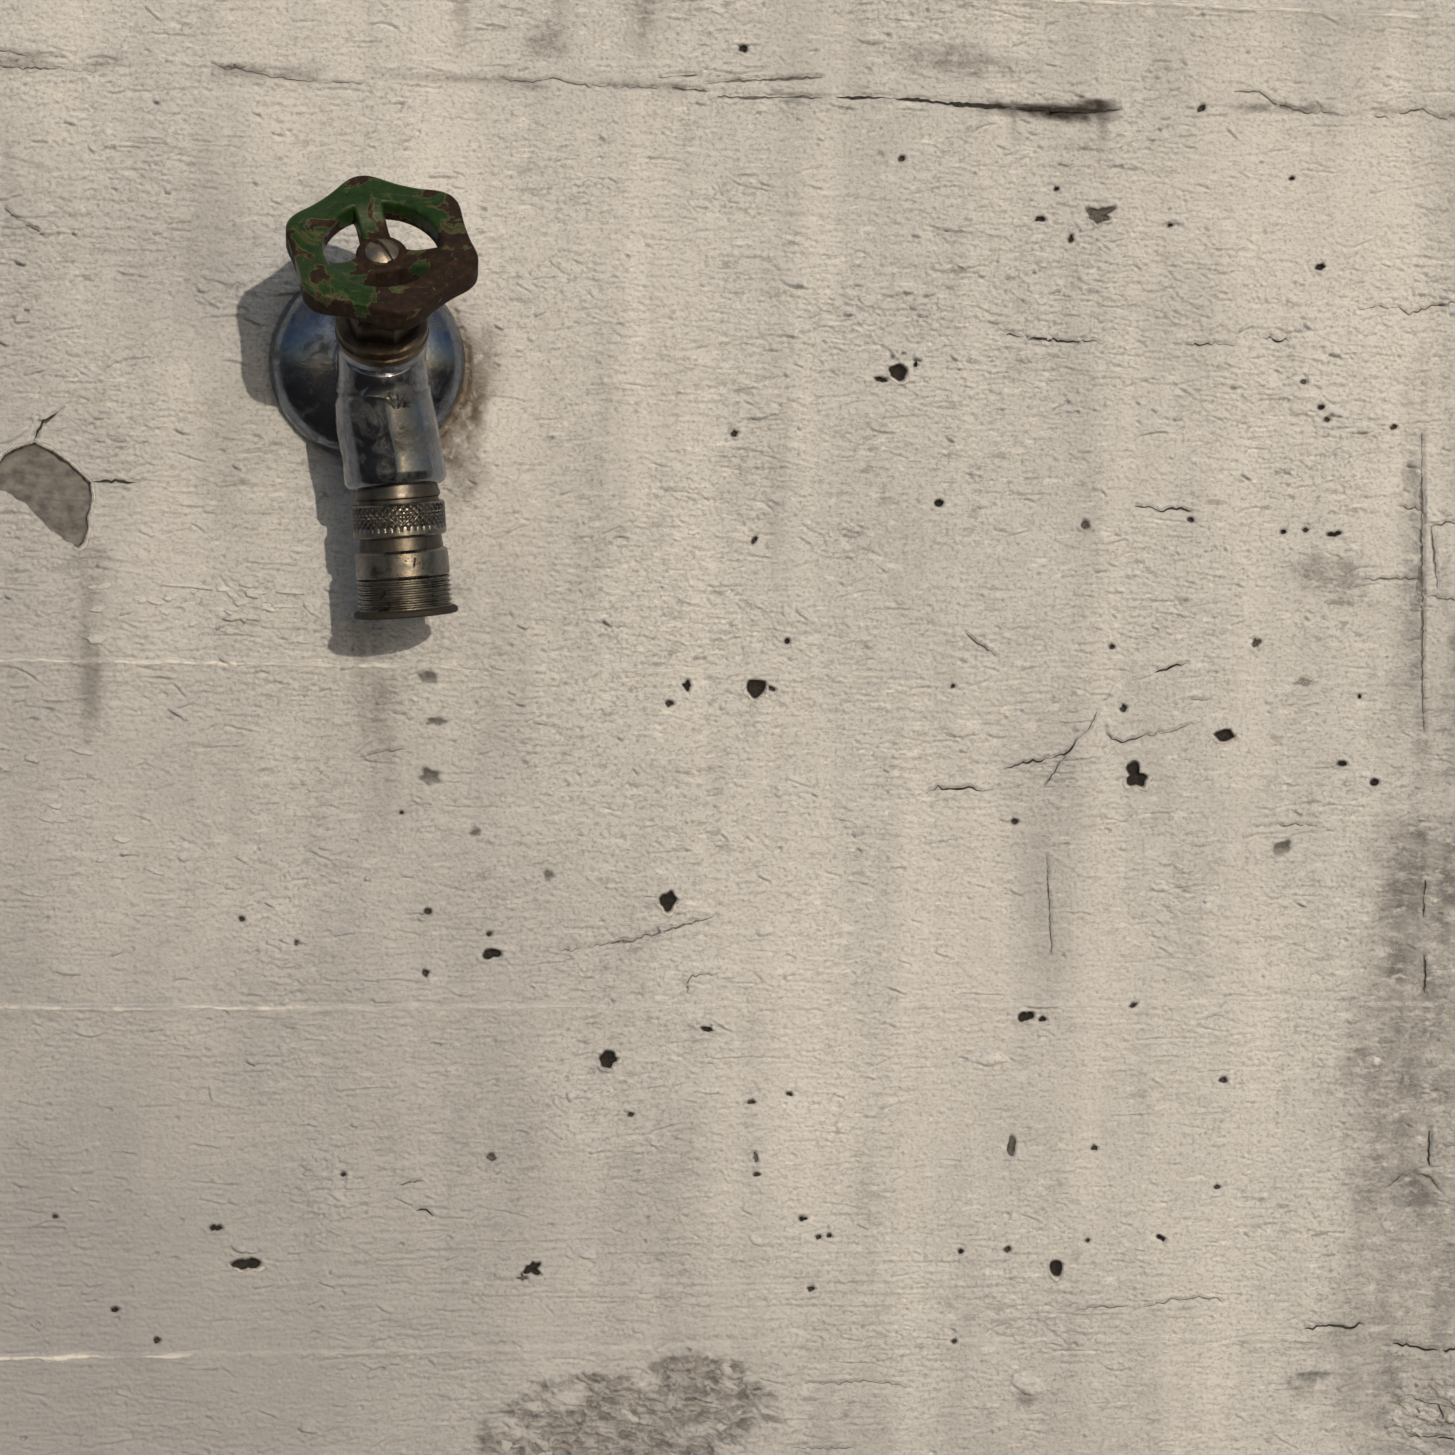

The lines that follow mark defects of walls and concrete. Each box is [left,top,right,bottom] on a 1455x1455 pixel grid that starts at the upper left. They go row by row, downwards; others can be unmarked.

crack [506,74,1120,113]
spalling [0,411,137,551]
crack [1368,437,1455,720]
crack [926,663,1199,794]
peeling [477,1356,775,1455]